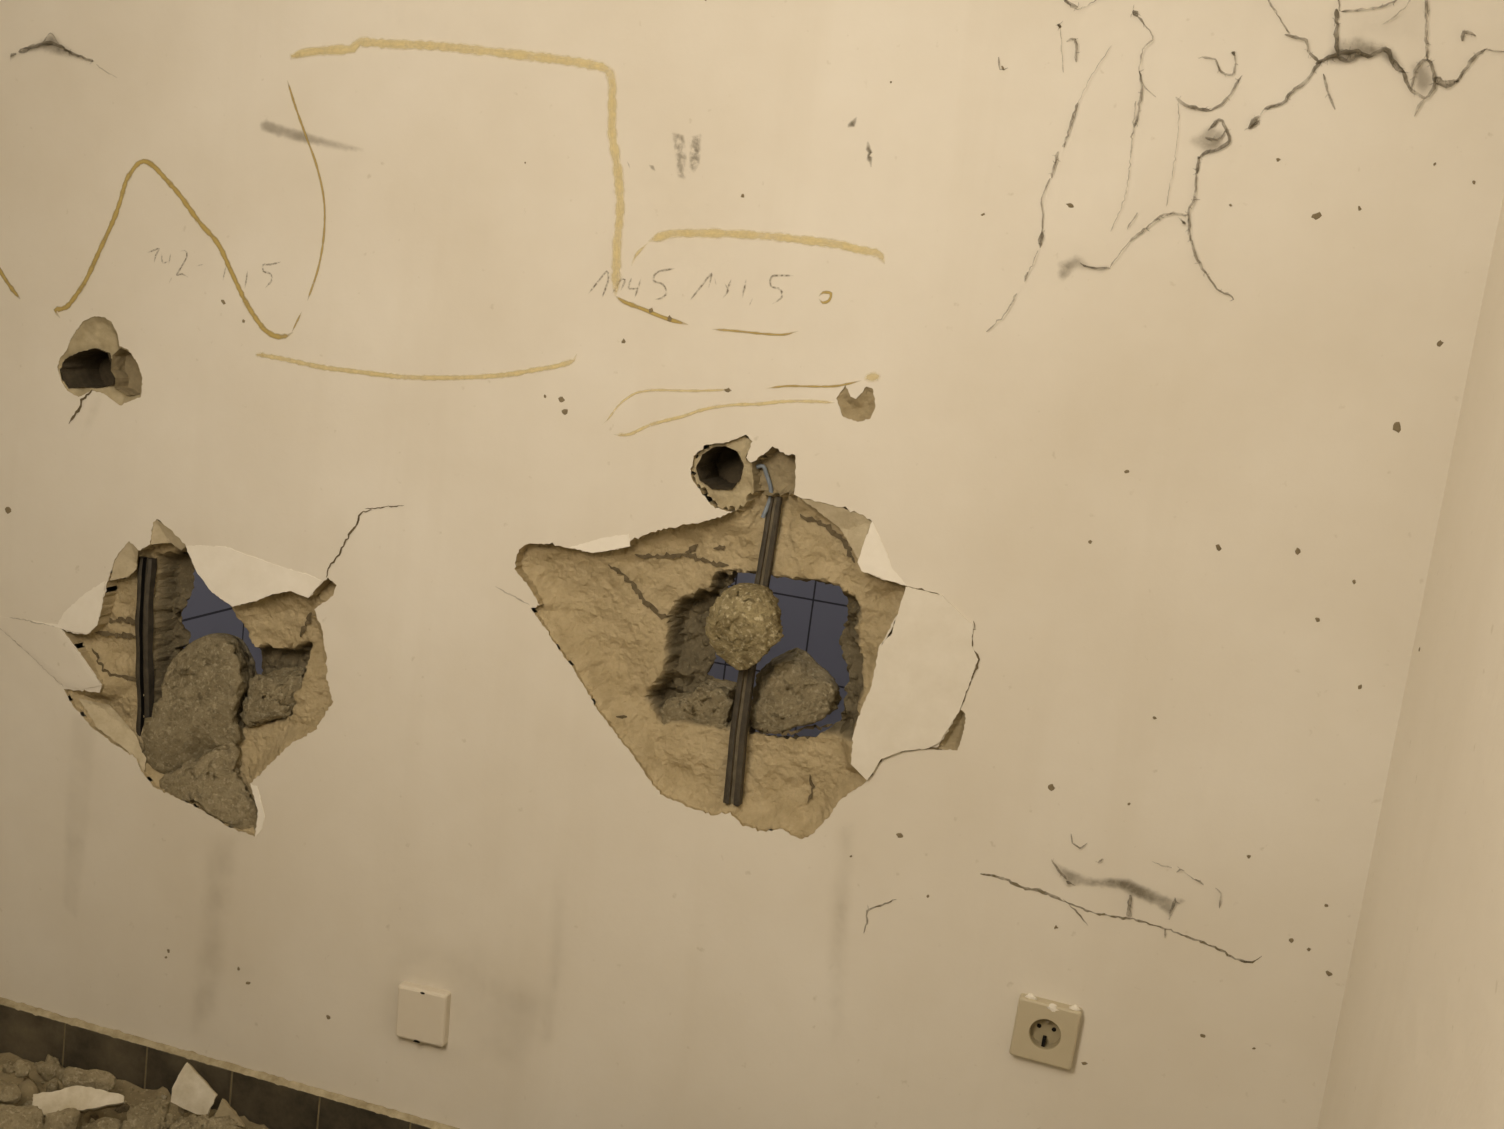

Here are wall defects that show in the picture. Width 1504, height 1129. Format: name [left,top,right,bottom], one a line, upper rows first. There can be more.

spalling [57,316,142,406]
crack [326,505,404,577]
flaking render [30,519,336,837]
flaking render [515,435,978,839]
crack [980,873,1262,963]